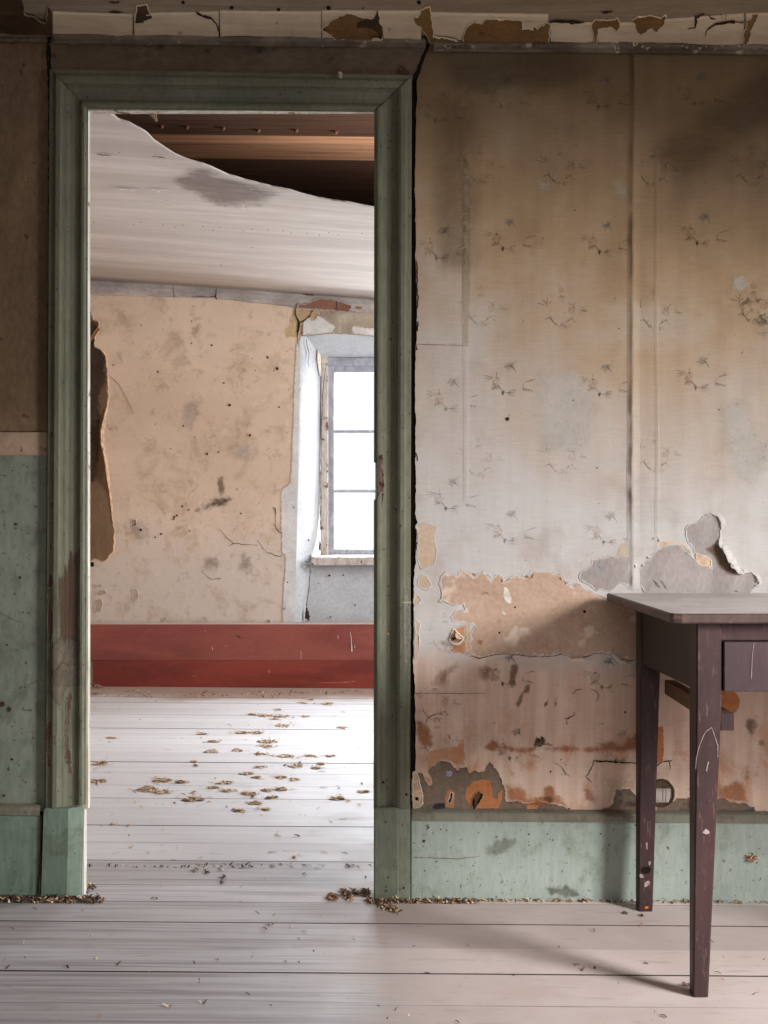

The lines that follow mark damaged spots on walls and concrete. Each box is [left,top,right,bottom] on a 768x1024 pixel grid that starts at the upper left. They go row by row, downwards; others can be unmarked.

peeling [285,297,362,339]
flaking render [448,628,464,645]
flaking render [411,760,572,810]
flaking render [601,788,636,810]